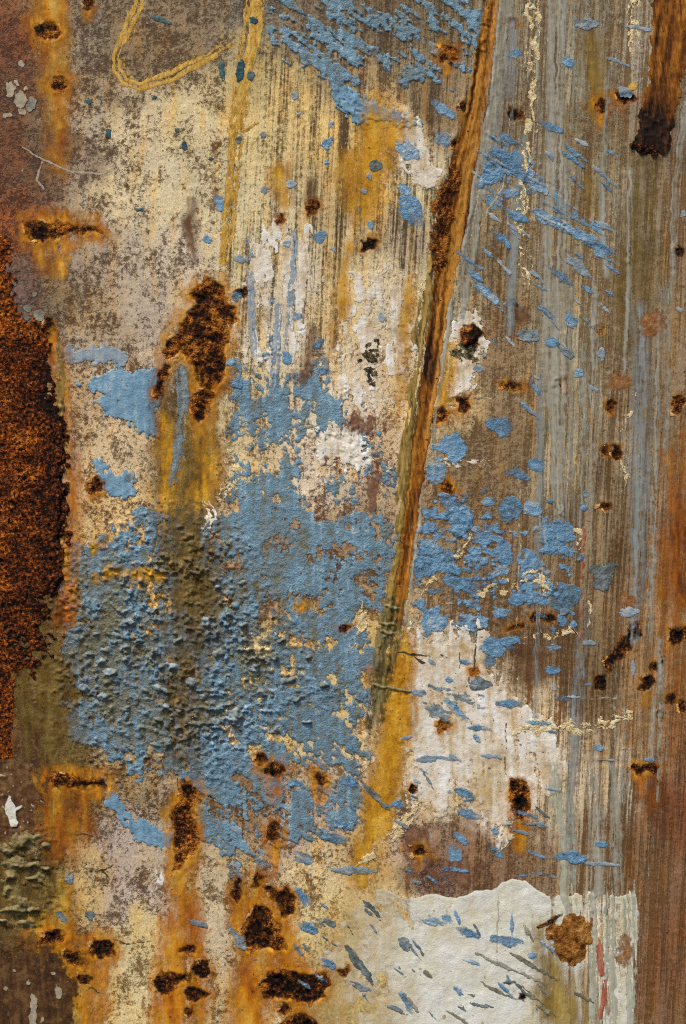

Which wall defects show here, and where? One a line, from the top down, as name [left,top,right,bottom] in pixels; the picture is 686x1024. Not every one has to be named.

peeling [264,0,484,194]
rust [629,0,686,157]
rust [150,273,239,513]
rust [440,323,483,403]
rust [0,211,109,764]
rust [91,566,165,582]
peeling [59,200,664,888]
rust [602,620,643,673]
rust [149,778,207,1024]
rust [226,871,332,1024]
peeling [319,879,639,1024]
rust [537,913,593,966]